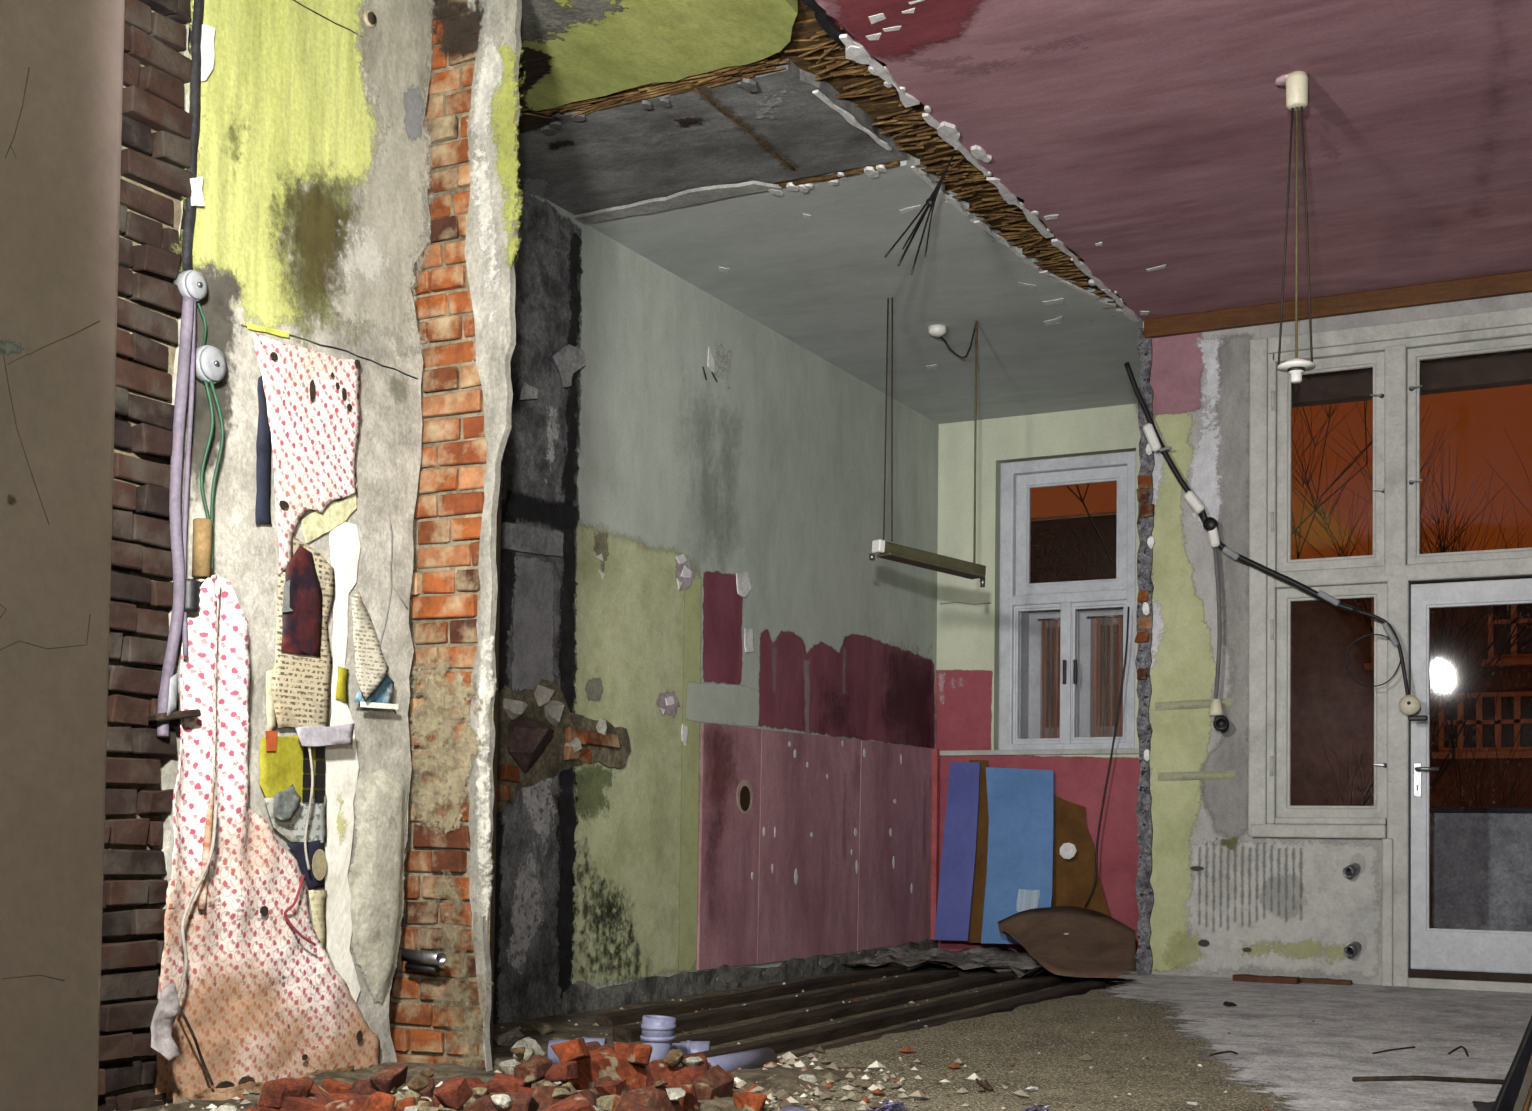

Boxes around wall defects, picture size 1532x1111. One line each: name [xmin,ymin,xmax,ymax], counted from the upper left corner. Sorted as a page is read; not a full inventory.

damp [273,180,364,307]
flaking render [97,0,767,1111]
damp [571,853,640,979]
flaking render [517,0,1165,975]